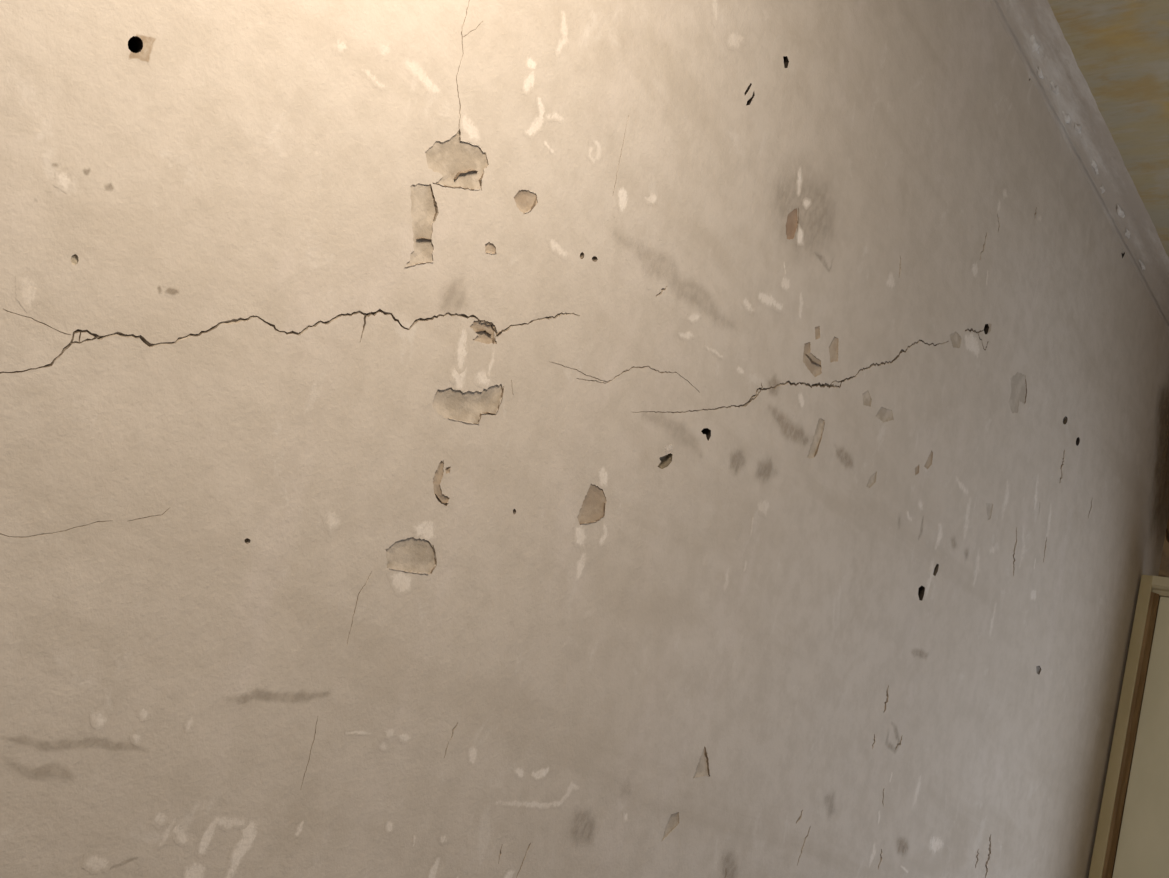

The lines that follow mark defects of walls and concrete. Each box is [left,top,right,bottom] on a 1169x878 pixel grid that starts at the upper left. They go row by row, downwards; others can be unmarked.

crack [456,0,483,140]
spalling [404,130,488,268]
spalling [514,190,538,214]
crack [0,309,580,374]
crack [552,328,988,413]
spalling [803,326,839,377]
spalling [432,380,513,424]
spalling [433,460,451,506]
spalling [577,484,606,525]
damp [1156,398,1169,523]
spalling [386,537,437,574]